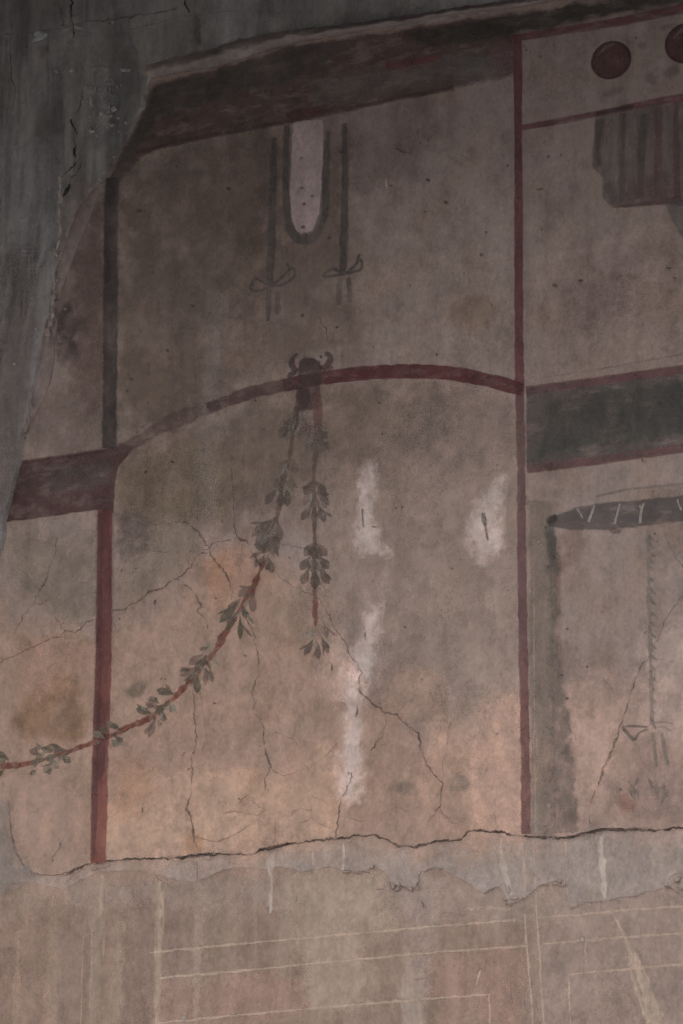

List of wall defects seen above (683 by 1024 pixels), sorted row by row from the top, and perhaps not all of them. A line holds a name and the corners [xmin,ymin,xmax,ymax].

crack [0,469,683,909]
damp [0,401,683,1024]